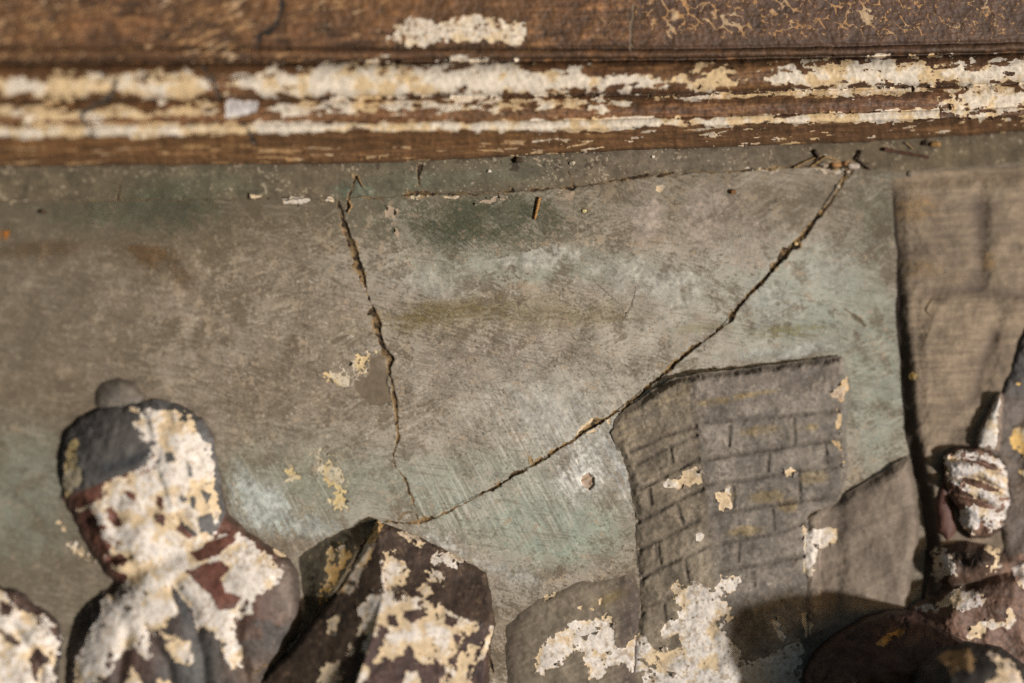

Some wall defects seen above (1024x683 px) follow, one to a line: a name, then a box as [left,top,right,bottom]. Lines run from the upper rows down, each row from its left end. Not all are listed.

peeling [0,0,1024,166]
peeling [0,590,63,683]
peeling [56,406,286,683]
peeling [285,448,354,512]
spalling [323,350,392,405]
peeling [316,520,494,683]
crack [127,160,877,674]
peeling [535,574,813,683]
peeling [915,547,1023,683]
peeling [943,396,1024,589]